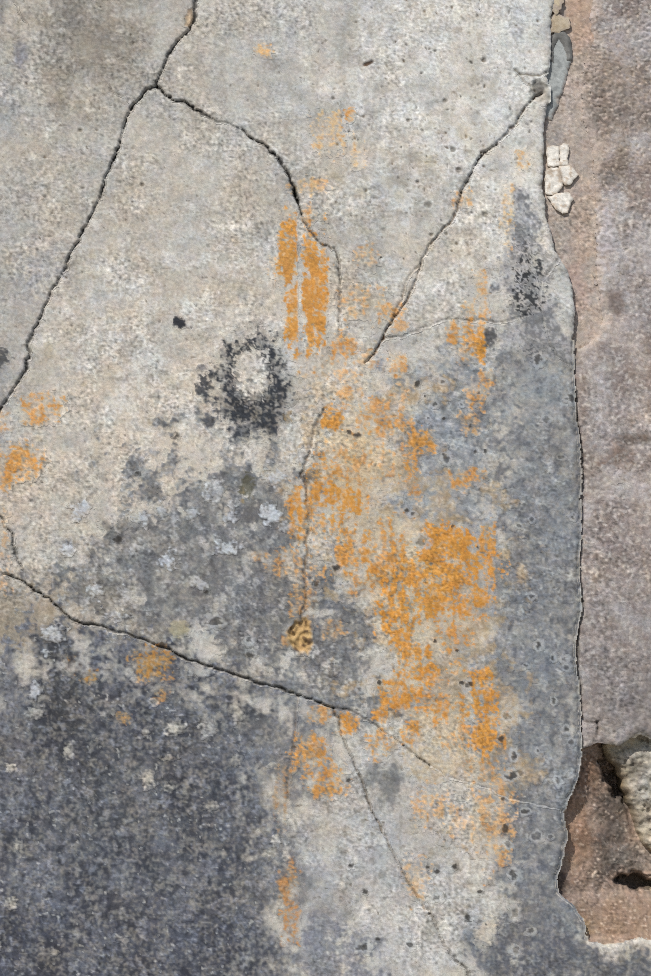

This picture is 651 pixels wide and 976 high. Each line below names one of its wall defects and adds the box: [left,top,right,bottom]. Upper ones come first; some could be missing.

crack [0,0,569,416]
crack [300,409,326,621]
crack [575,391,586,527]
leakage [0,316,408,976]
crack [0,515,560,976]
crack [577,583,600,736]
spalling [557,743,651,944]